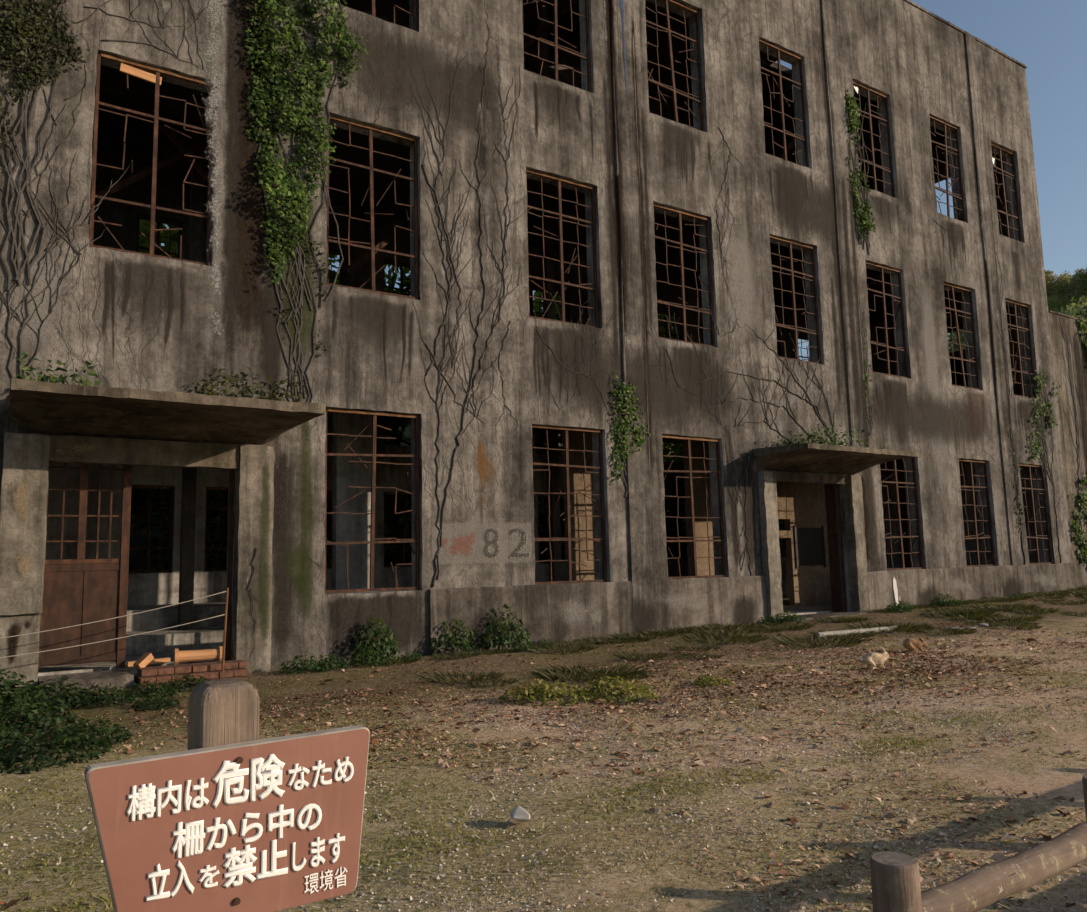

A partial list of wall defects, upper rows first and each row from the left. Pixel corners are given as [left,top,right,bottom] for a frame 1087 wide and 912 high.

damp [103,262,186,359]
damp [203,0,283,386]
damp [333,296,414,380]
damp [534,0,728,458]